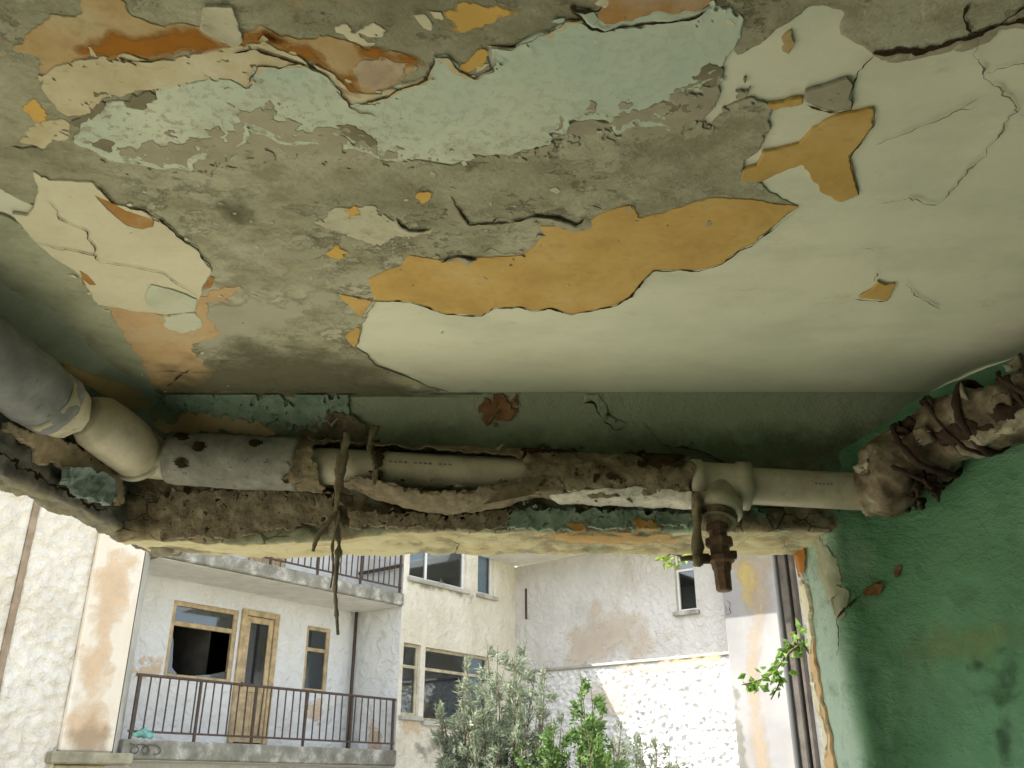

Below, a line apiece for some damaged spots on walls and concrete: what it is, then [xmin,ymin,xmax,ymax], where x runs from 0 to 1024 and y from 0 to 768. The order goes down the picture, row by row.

crack [849,6,1024,206]
crack [392,196,630,265]
spalling [0,0,1024,439]
spalling [1,422,125,506]
spalling [156,485,693,547]
flaking render [799,535,850,768]